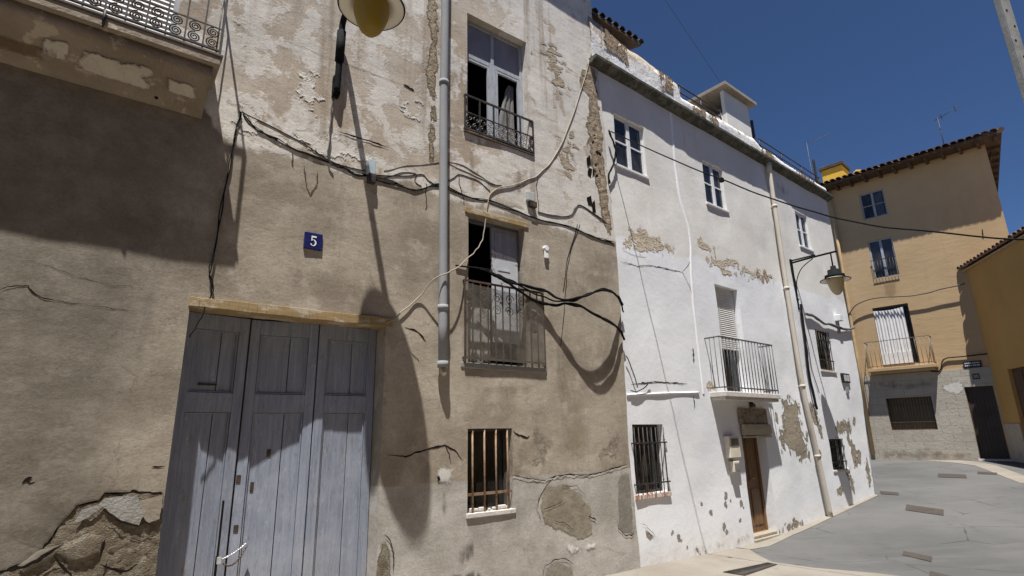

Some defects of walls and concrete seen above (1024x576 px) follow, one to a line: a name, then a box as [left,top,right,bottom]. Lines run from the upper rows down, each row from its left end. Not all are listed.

peeling [41,38,158,99]
peeling [168,79,197,99]
spalling [397,0,440,163]
spalling [531,27,612,234]
crack [1,259,145,311]
peeling [623,226,675,256]
peeling [695,236,774,282]
crack [388,444,461,463]
peeling [775,395,873,495]
spalling [0,434,163,576]